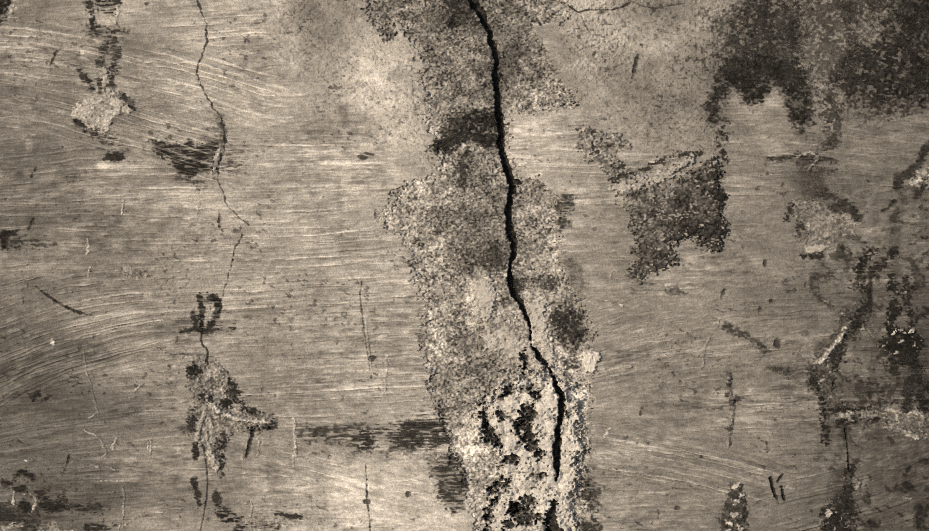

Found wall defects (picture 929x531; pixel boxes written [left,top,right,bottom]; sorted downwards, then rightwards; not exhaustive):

water stain [701,0,929,146]
crack [201,332,209,384]
water stain [179,292,236,334]
crack [196,0,249,311]
flaking render [361,0,602,531]
crack [468,0,569,531]
flaking render [575,117,731,288]
water stain [848,248,929,413]
water stain [190,478,202,509]
crack [197,410,274,528]
water stain [212,491,302,531]
water stain [818,460,861,531]